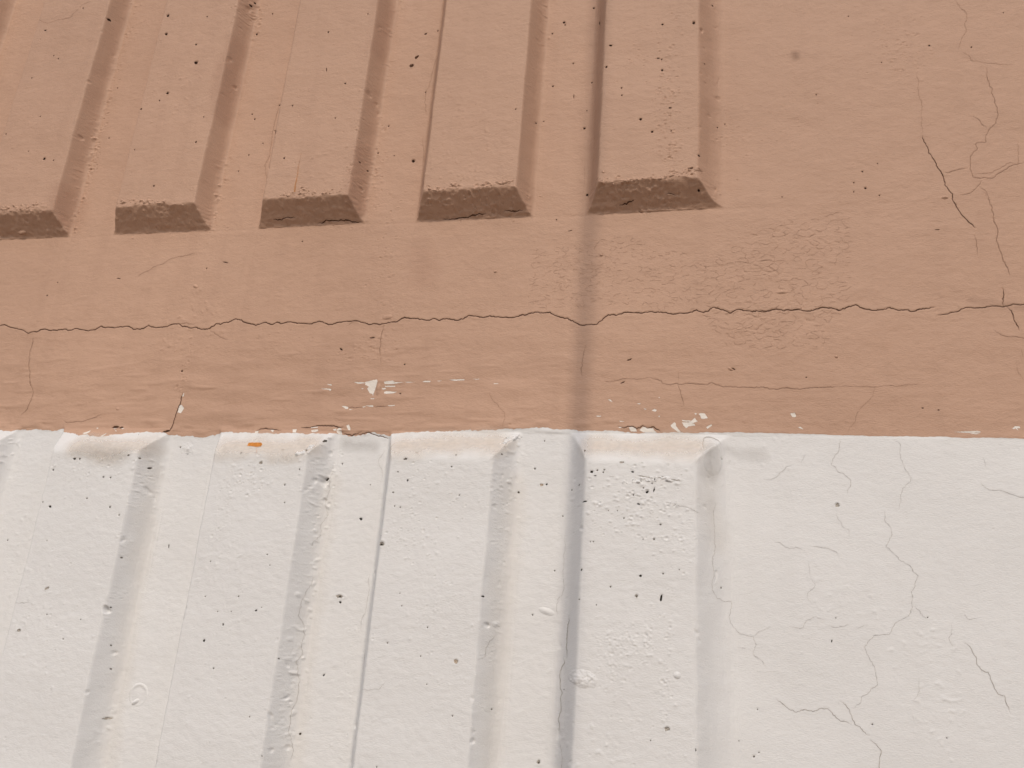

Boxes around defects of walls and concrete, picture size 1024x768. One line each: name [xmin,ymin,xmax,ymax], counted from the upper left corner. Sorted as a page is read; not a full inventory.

crack [0,3,1024,409]
peeling [342,379,478,410]
peeling [671,413,712,433]
crack [779,440,924,768]
crack [950,611,1009,707]